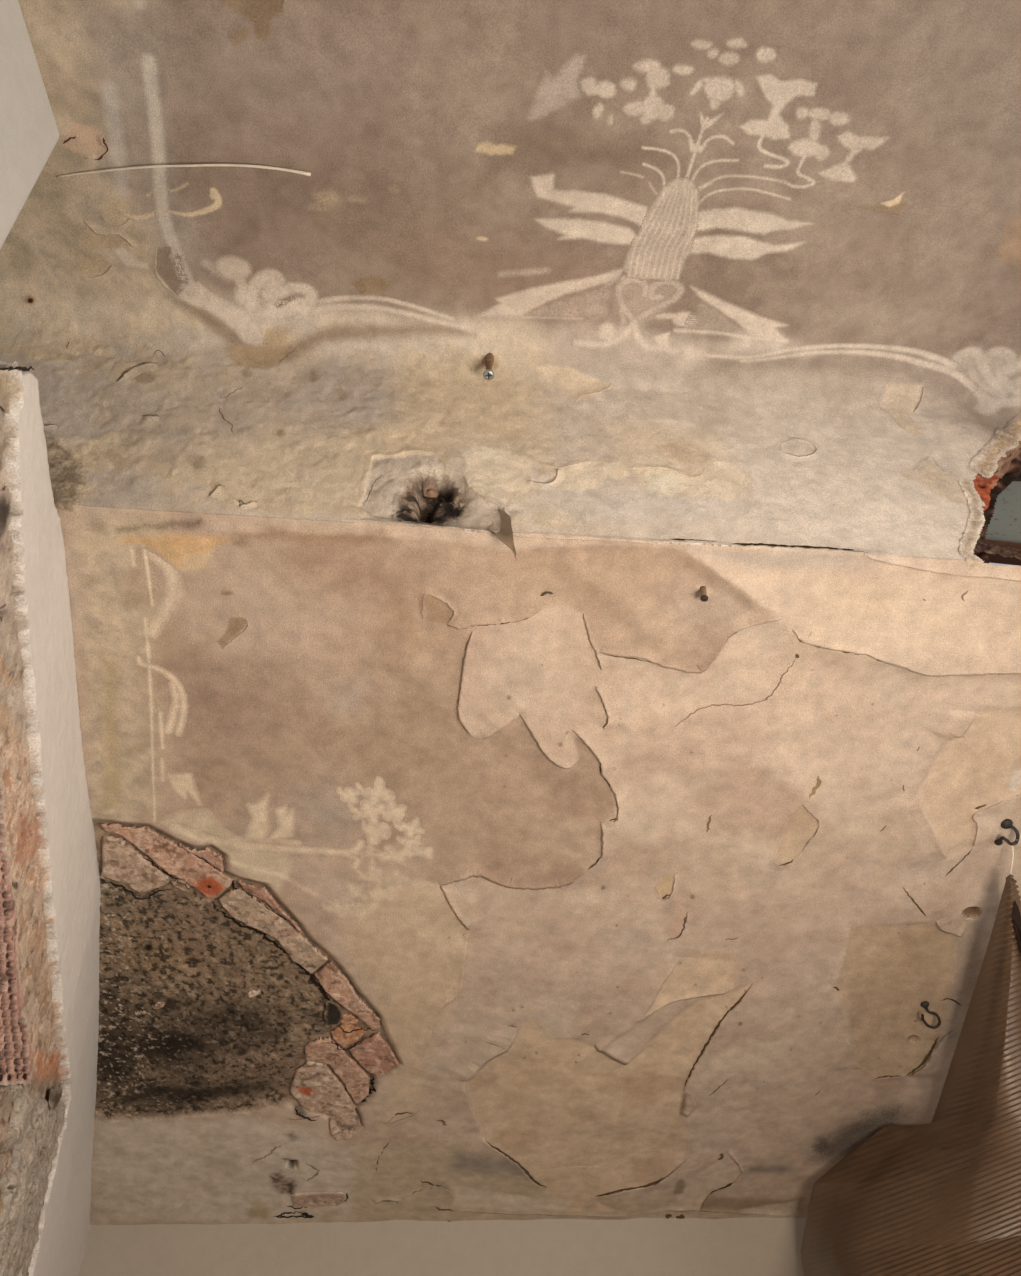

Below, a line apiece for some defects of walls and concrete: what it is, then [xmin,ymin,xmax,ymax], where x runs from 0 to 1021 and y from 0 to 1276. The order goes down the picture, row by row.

peeling [876,381,927,437]
spalling [897,413,1021,571]
peeling [92,439,785,1223]
peeling [769,776,825,871]
peeling [909,706,1021,877]
peeling [829,888,967,1084]